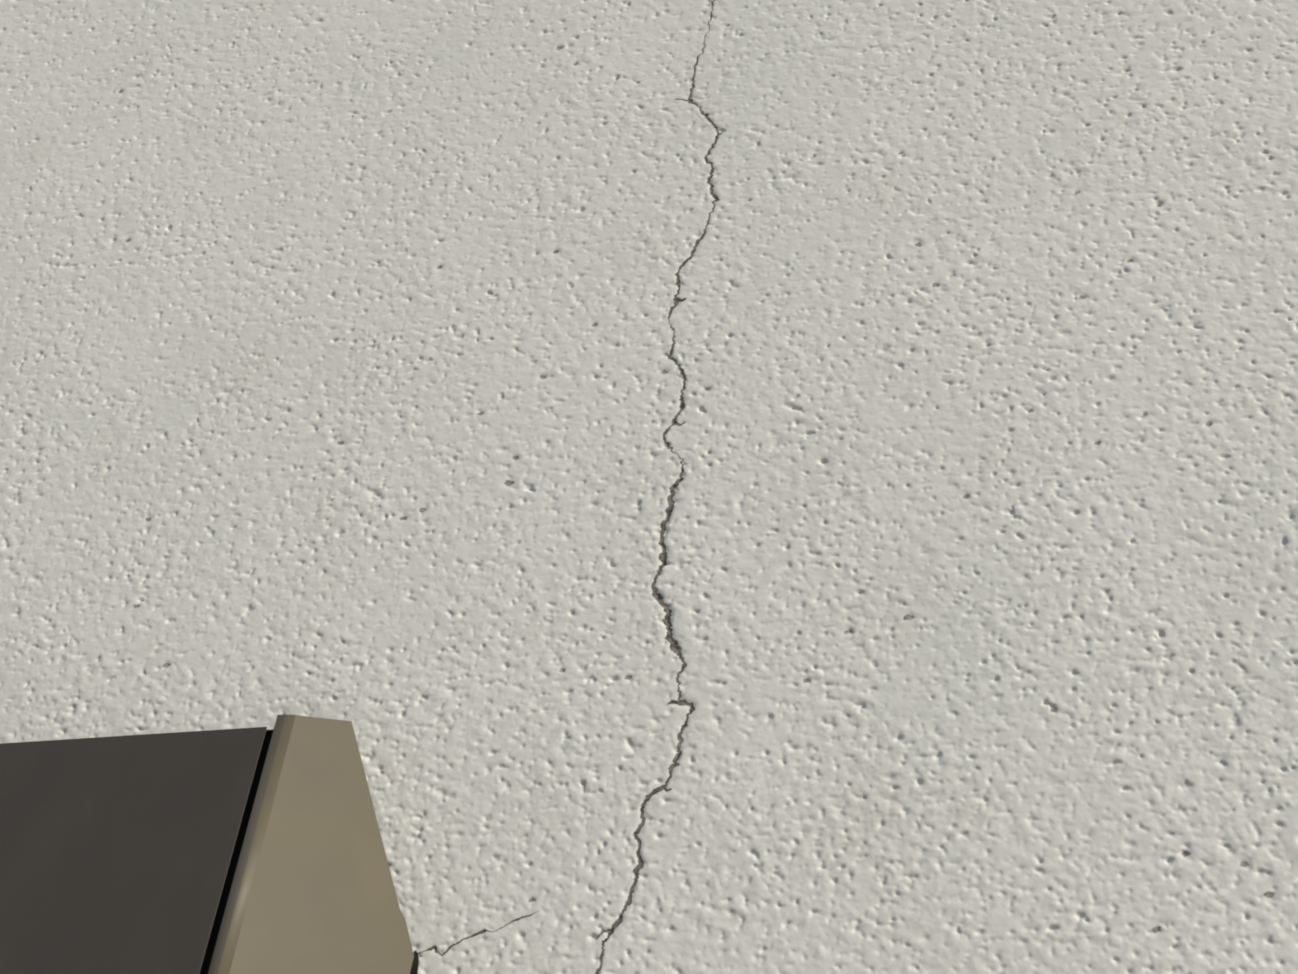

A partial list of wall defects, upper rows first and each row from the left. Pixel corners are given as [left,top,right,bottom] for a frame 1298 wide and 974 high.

crack [418,911,538,956]
crack [596,0,726,974]